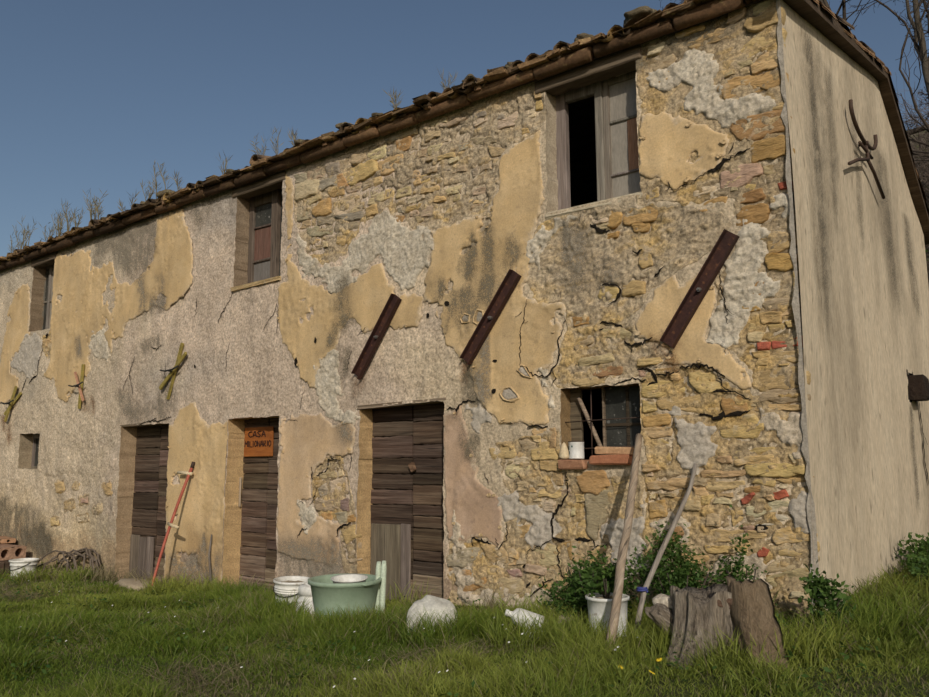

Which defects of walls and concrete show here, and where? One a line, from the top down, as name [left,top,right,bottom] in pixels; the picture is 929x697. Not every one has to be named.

flaking render [0,283,30,403]
damp [438,224,495,330]
crack [515,299,566,384]
flaking render [276,0,821,619]
crack [471,523,508,549]
crack [523,472,607,597]